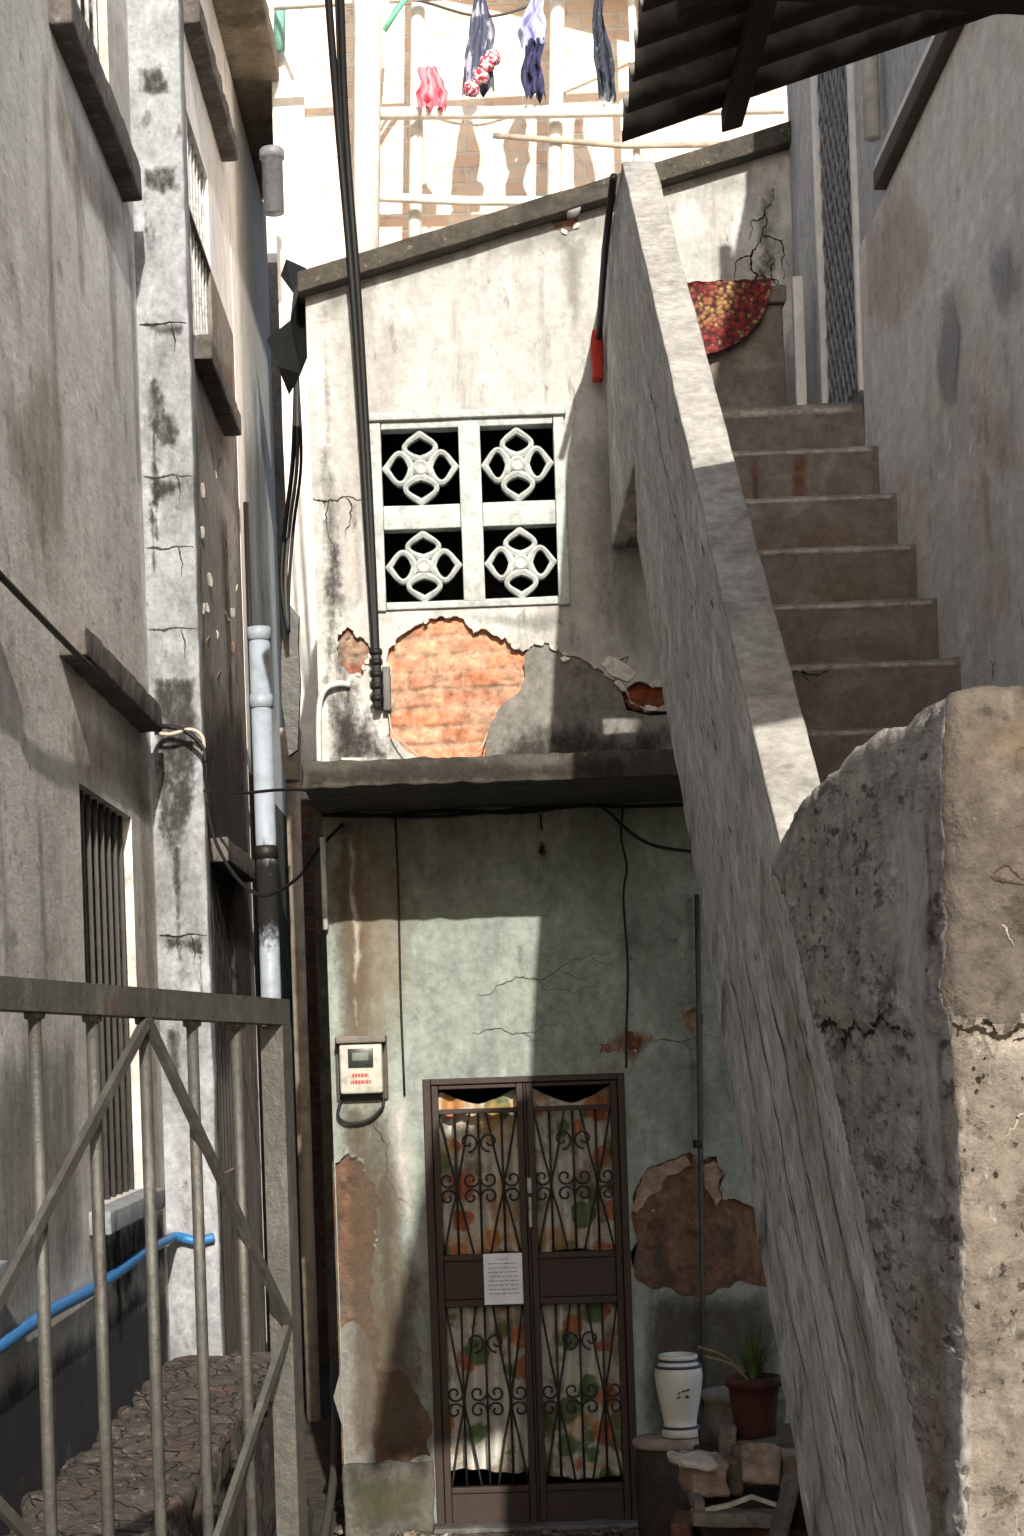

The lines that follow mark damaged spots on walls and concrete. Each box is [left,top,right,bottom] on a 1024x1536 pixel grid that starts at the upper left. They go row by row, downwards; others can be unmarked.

crack [734,189,785,285]
crack [140,321,186,350]
crack [144,474,190,497]
crack [147,545,193,576]
flaking render [337,614,673,758]
leakage [156,524,252,996]
flaking render [630,1152,788,1312]
crack [648,885,1024,1536]
flaking render [332,1153,433,1464]